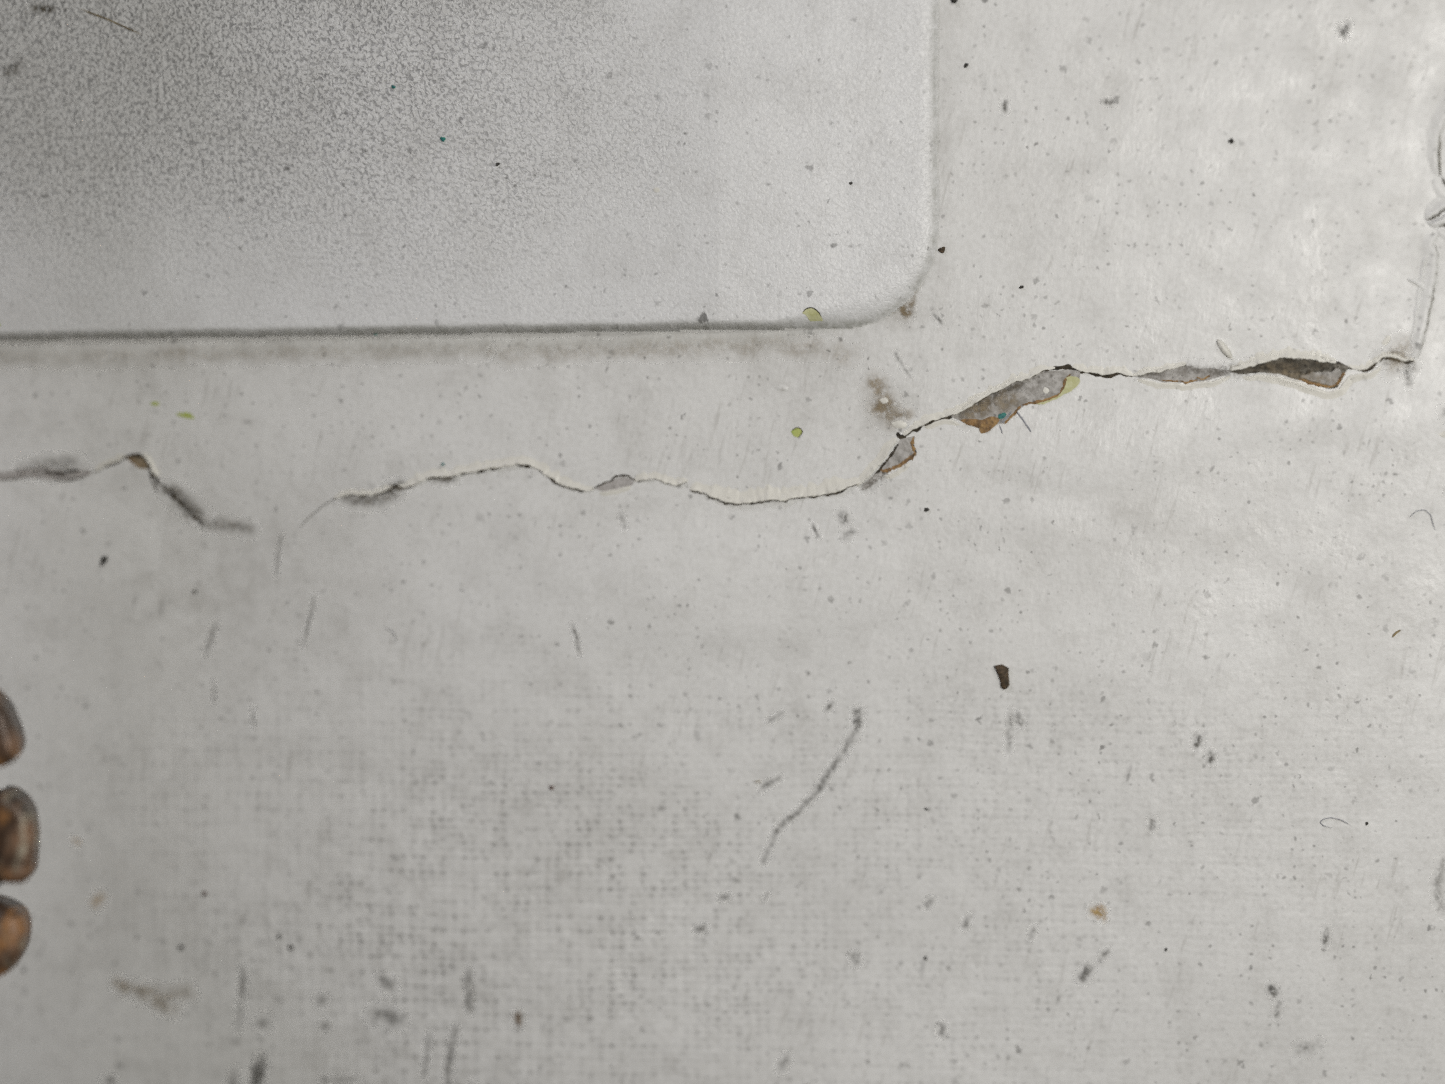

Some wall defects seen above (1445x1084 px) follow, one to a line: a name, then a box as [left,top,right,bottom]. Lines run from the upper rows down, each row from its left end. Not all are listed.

peeling [856,369,1080,490]
crack [896,361,1187,439]
peeling [1137,339,1381,400]
crack [1229,346,1415,379]
crack [93,453,237,527]
crack [300,455,594,527]
crack [634,471,861,506]